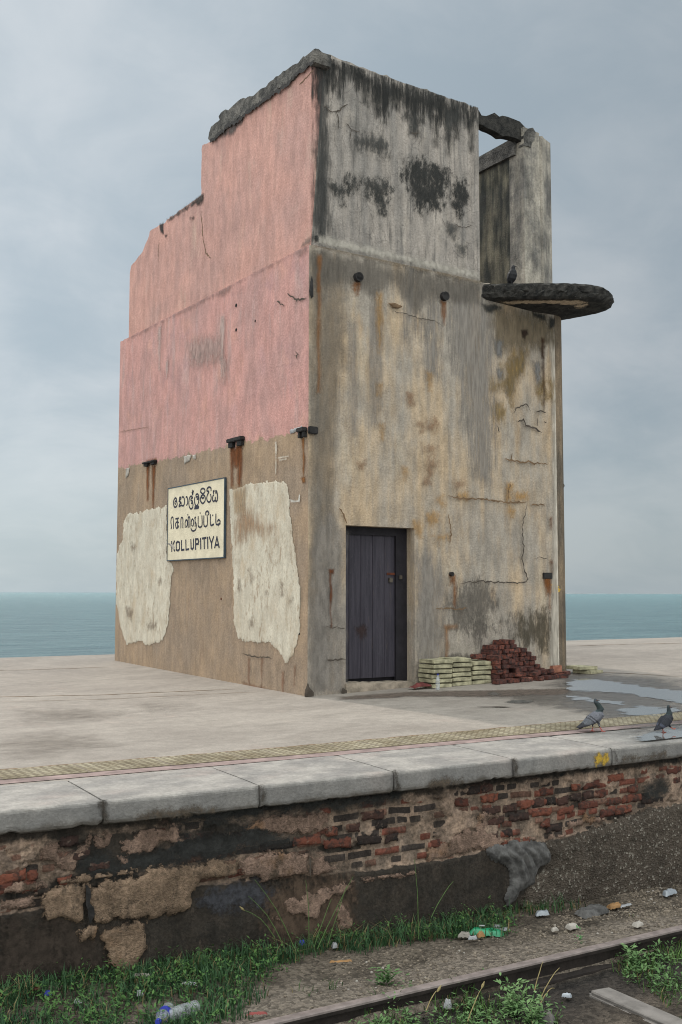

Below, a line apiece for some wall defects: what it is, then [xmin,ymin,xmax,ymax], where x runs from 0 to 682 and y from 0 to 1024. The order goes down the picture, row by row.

water stain [298,59,555,481]
peeling [116,505,174,646]
corrosion [146,459,156,504]
corrosion [230,446,242,488]
peeling [229,480,300,663]
crack [436,455,547,610]
water stain [314,518,682,728]
crack [497,403,547,433]
flaking render [0,868,38,910]
peeling [57,800,238,942]
flaking render [259,809,398,876]
flaking render [429,750,681,838]